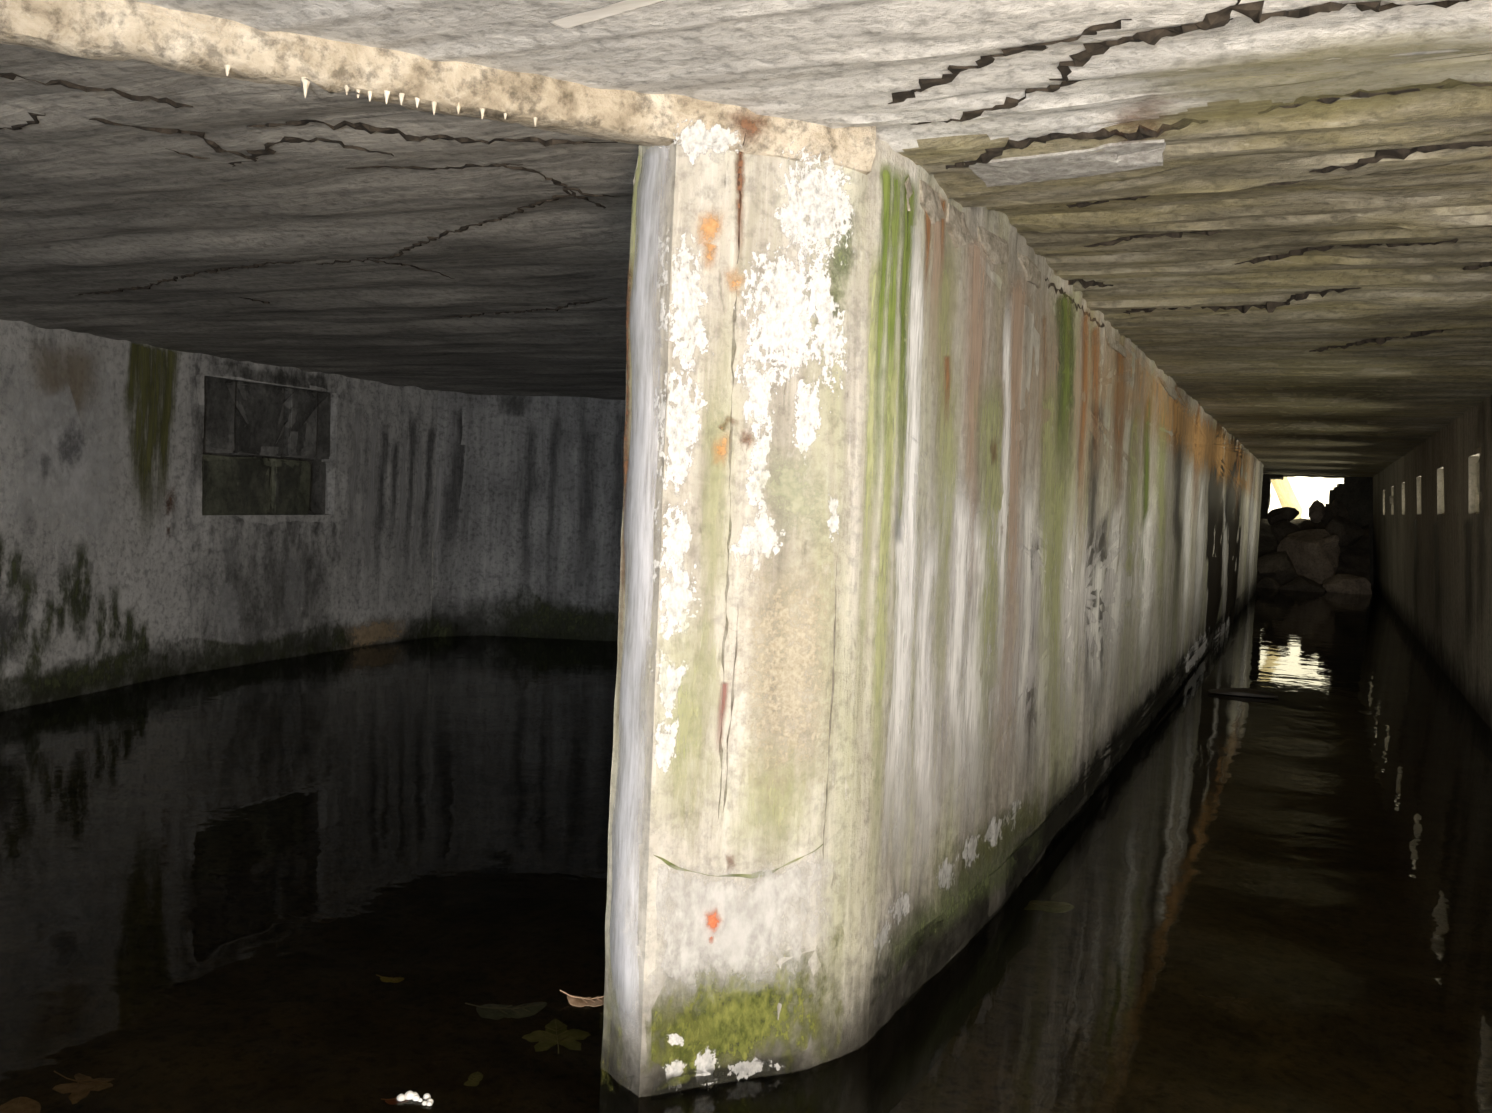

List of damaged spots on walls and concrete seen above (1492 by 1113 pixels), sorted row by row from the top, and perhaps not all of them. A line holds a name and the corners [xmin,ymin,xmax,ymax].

crack [0,112,45,131]
crack [89,117,394,167]
crack [75,163,621,304]
crack [447,298,608,318]
corrosion [926,198,945,292]
leakage [127,343,177,498]
leakage [348,413,464,552]
leakage [614,419,625,522]
corrosion [993,288,1253,569]
leakage [0,540,148,673]
leakage [865,167,1255,1007]
leakage [653,1061,789,1099]